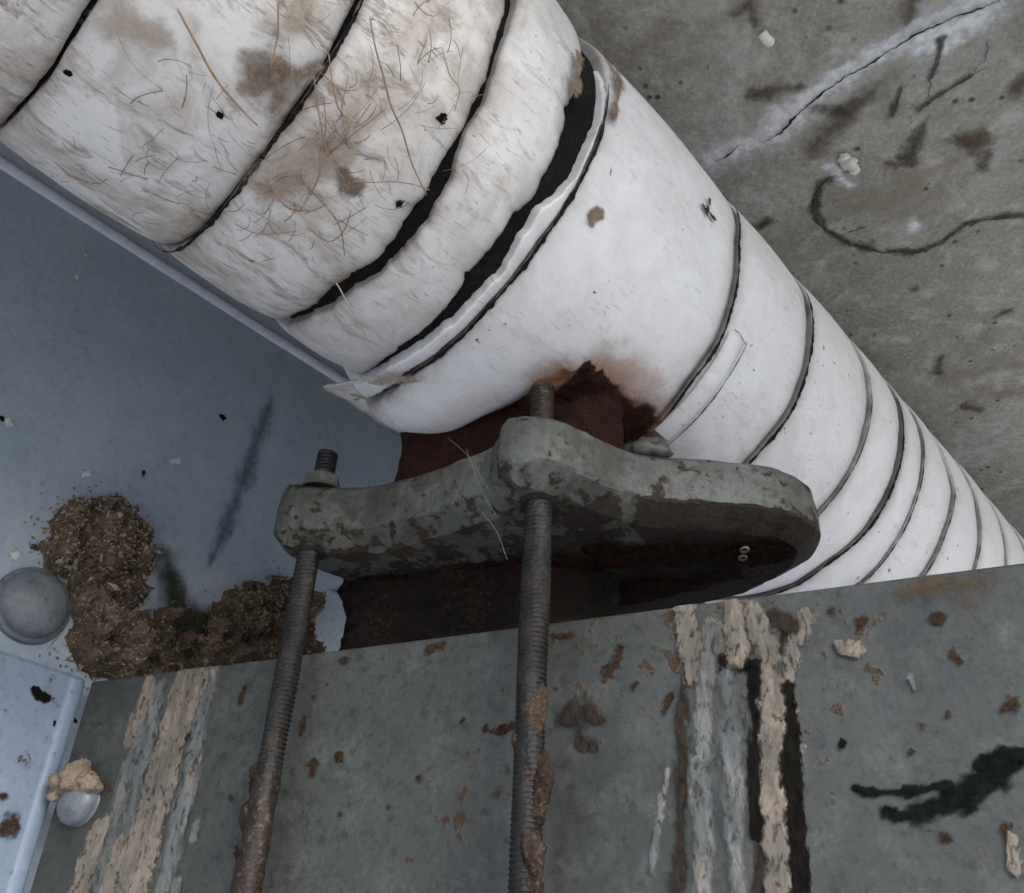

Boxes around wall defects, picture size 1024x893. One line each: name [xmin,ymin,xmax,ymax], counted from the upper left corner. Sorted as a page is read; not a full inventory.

crack [692,0,1006,172]
crack [811,175,1024,255]
rust [591,358,662,442]
rust [600,644,624,683]
rust [307,758,318,778]
rust [556,691,605,754]
leakage [668,598,815,893]
leakage [851,745,1024,826]
peeling [189,819,200,844]